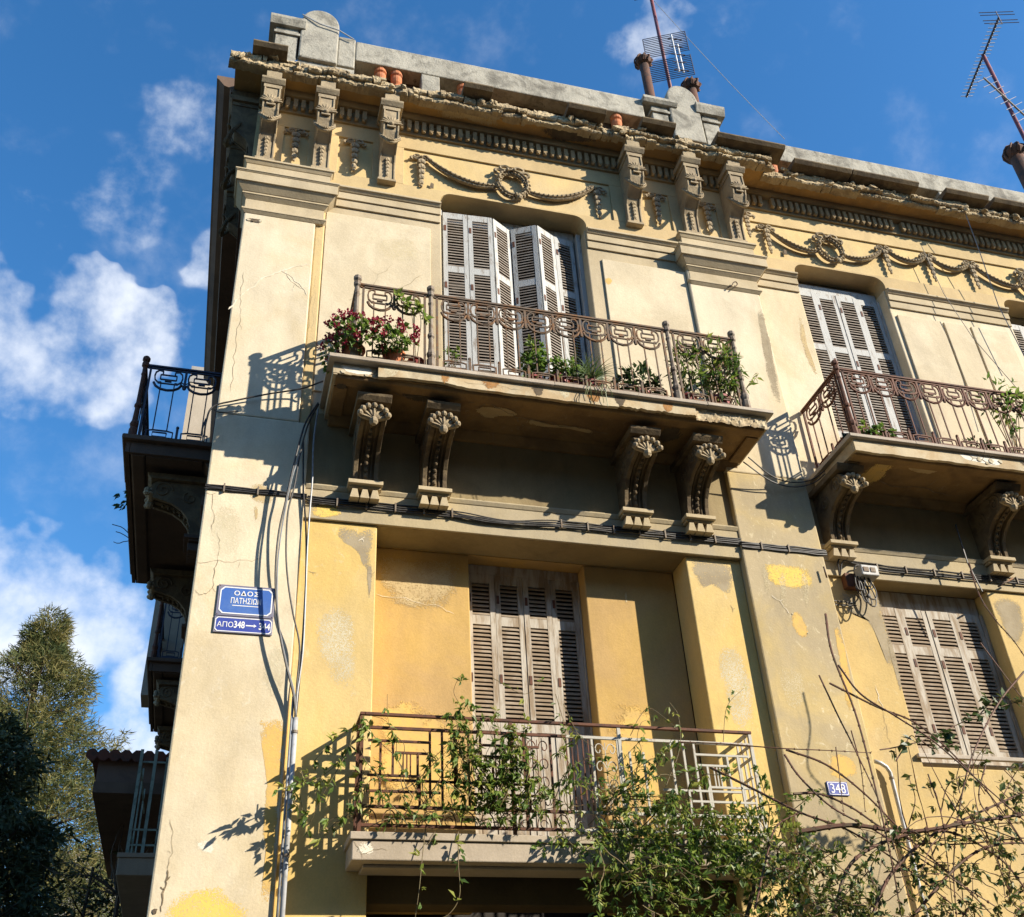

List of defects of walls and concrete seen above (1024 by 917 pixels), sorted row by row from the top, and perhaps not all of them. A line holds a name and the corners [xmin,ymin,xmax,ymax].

spalling [228,50,1024,230]
crack [229,264,316,384]
crack [197,492,256,595]